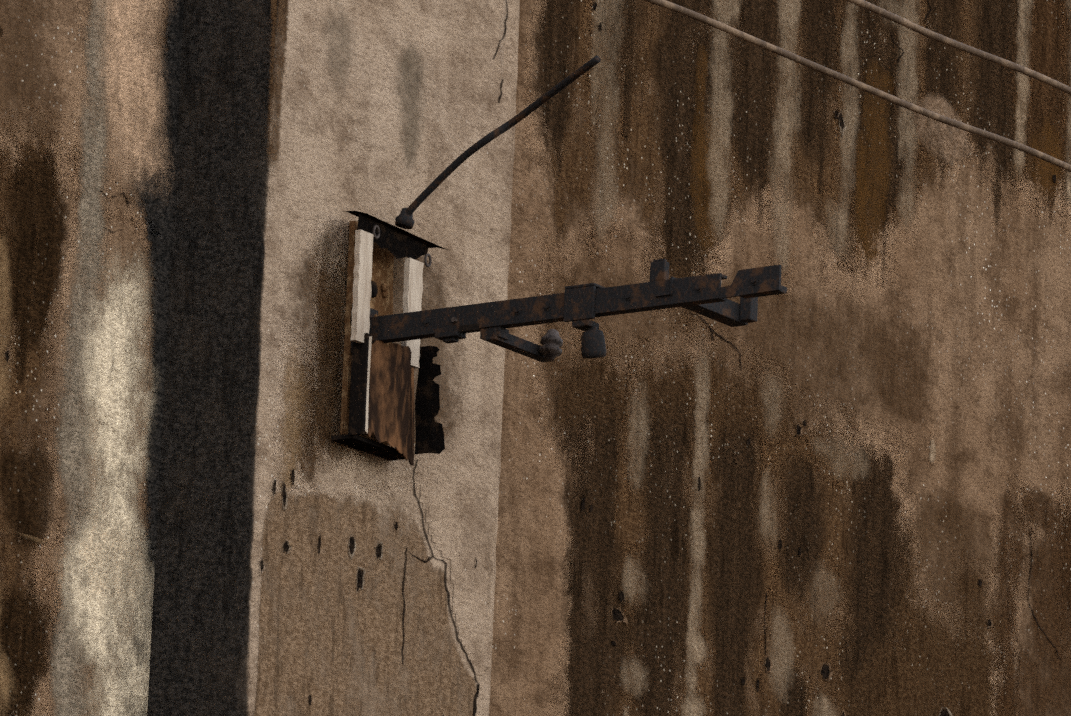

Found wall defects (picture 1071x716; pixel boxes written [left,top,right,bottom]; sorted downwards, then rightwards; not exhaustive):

crack [493,1,508,103]
water stain [535,0,1071,278]
water stain [0,0,288,716]
peeling [254,469,476,716]
crack [401,460,480,716]
water stain [553,357,1071,716]